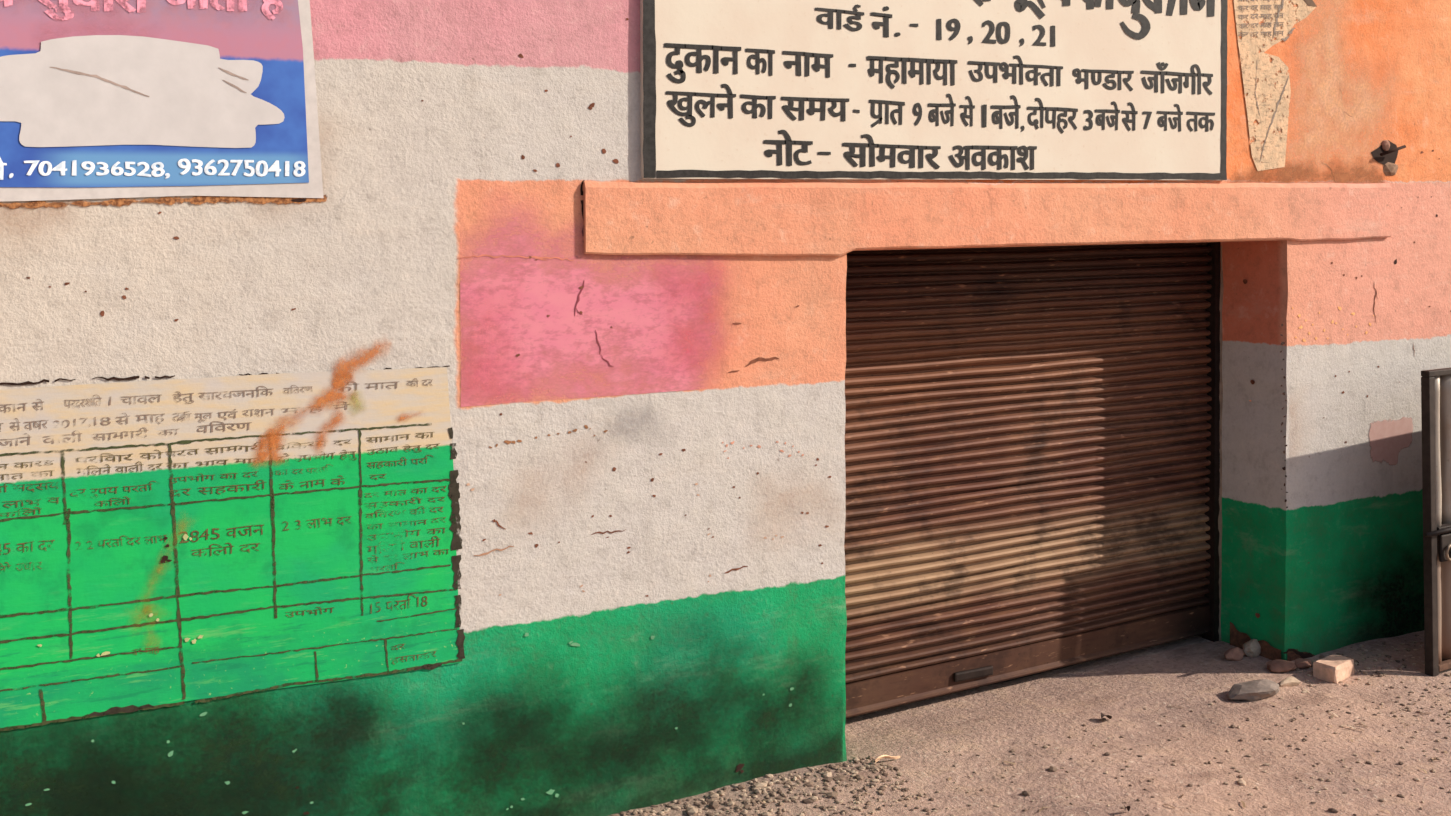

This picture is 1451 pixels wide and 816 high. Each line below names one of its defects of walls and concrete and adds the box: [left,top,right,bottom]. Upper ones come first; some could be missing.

water stain [0,696,375,816]
water stain [446,684,701,808]
water stain [633,671,843,808]